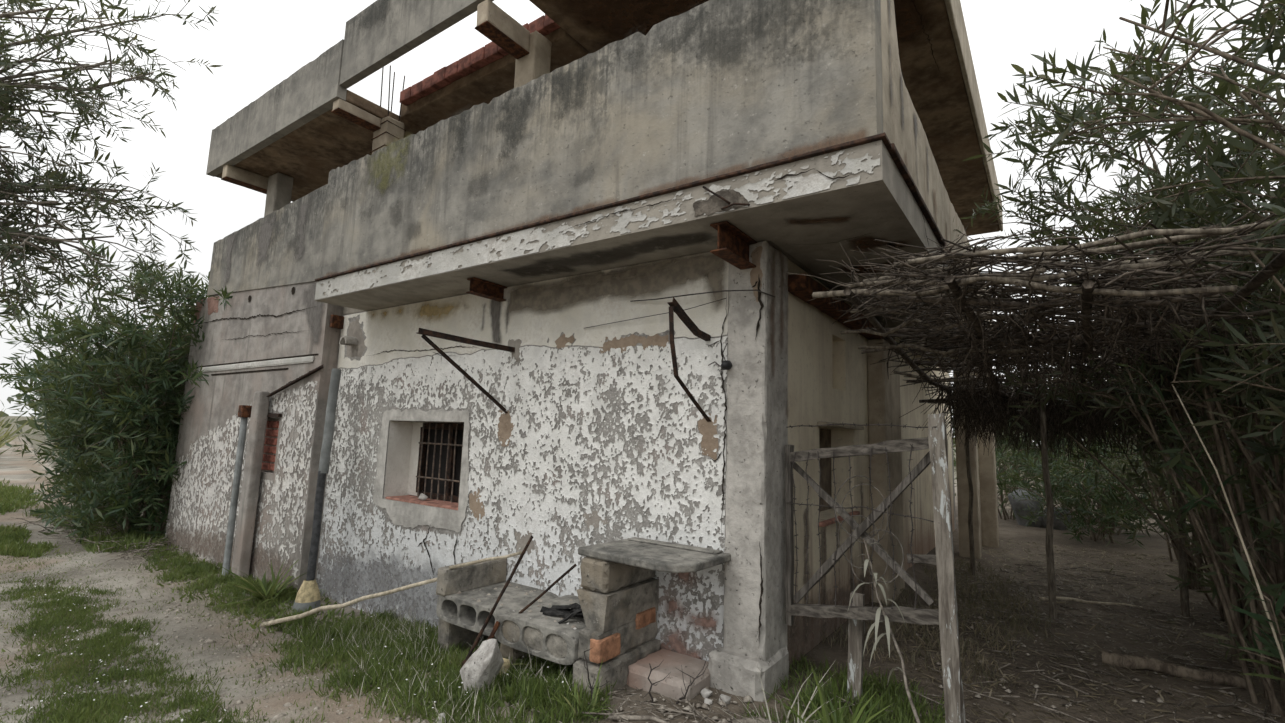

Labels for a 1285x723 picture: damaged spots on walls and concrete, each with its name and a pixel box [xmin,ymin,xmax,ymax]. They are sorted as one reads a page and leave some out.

water stain [559,0,709,46]
peeling [315,151,880,302]
crack [204,306,317,340]
peeling [166,405,252,565]
peeling [252,381,317,587]
peeling [316,318,727,662]